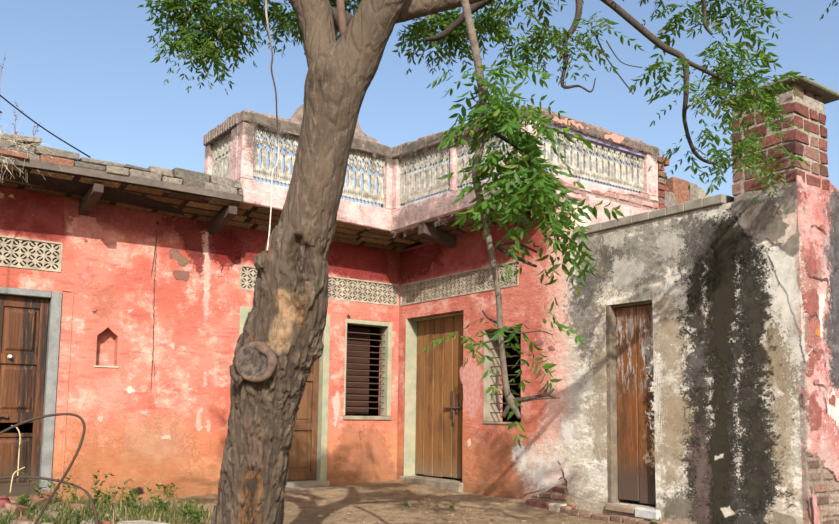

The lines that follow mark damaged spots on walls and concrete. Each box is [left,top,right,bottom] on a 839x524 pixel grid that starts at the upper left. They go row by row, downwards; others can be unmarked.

peeling [169,248,191,282]
peeling [202,231,211,322]
water stain [599,185,839,524]
peeling [767,203,839,431]
peeling [194,408,211,434]
flaking render [804,449,839,524]